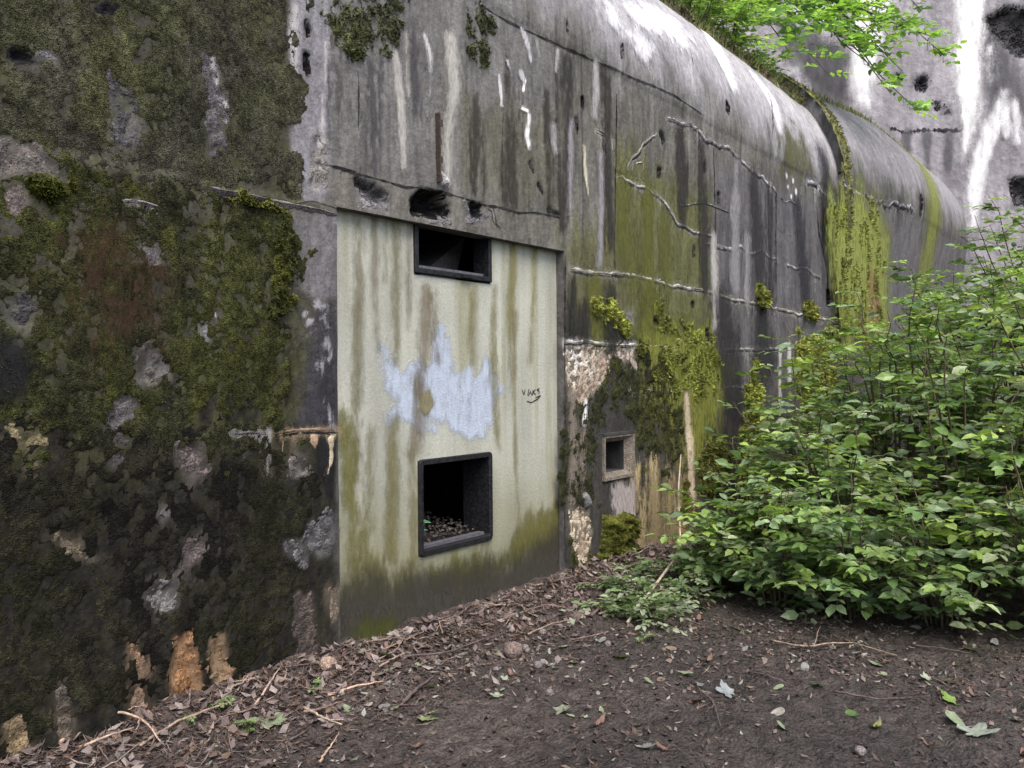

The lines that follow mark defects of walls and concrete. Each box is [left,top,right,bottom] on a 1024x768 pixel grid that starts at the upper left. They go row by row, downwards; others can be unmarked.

leakage [604,0,737,91]
spalling [982,3,1024,59]
leakage [498,27,532,214]
leakage [945,0,1024,227]
spalling [408,188,452,229]
leakage [544,50,673,355]
crack [483,5,914,563]
leakage [676,127,792,428]
peeling [563,345,637,404]
leakage [340,529,560,640]
peeling [568,503,592,563]
spalling [130,643,148,719]